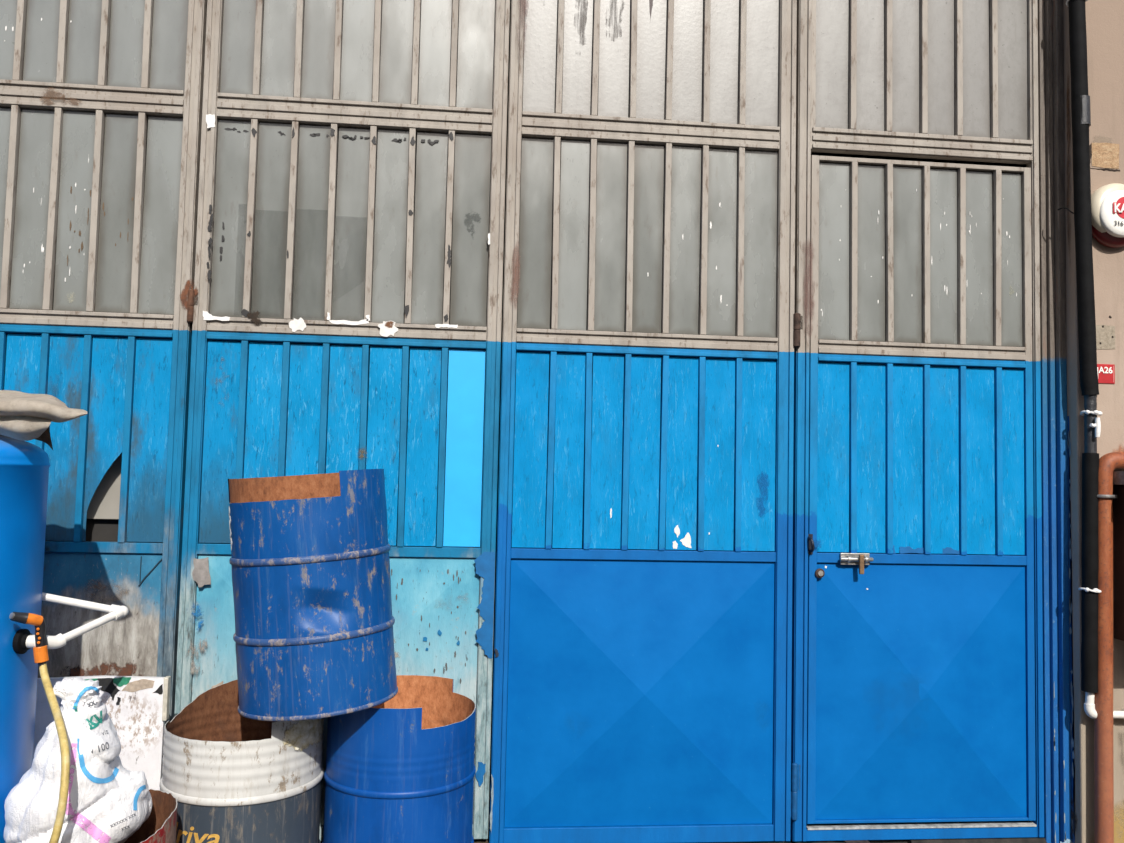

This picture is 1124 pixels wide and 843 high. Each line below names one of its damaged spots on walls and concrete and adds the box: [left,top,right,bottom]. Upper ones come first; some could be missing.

leakage [579,0,588,42]
rust [180,280,198,309]
peeling [673,525,691,549]